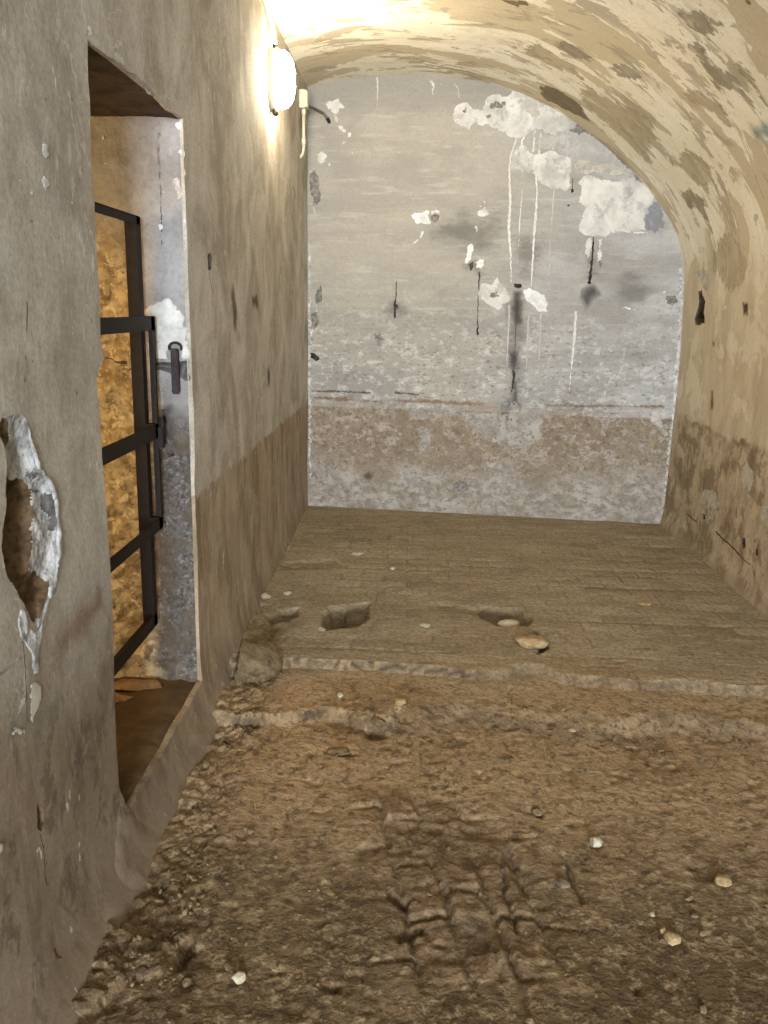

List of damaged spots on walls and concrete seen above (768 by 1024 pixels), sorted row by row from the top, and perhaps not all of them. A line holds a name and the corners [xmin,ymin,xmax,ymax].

flaking render [677,9,768,112]
flaking render [453,41,660,264]
flaking render [685,90,731,127]
flaking render [411,210,440,244]
flaking render [144,298,191,361]
flaking render [465,244,522,335]
leakage [503,130,542,421]
flaking render [0,414,62,674]
crack [687,514,751,565]